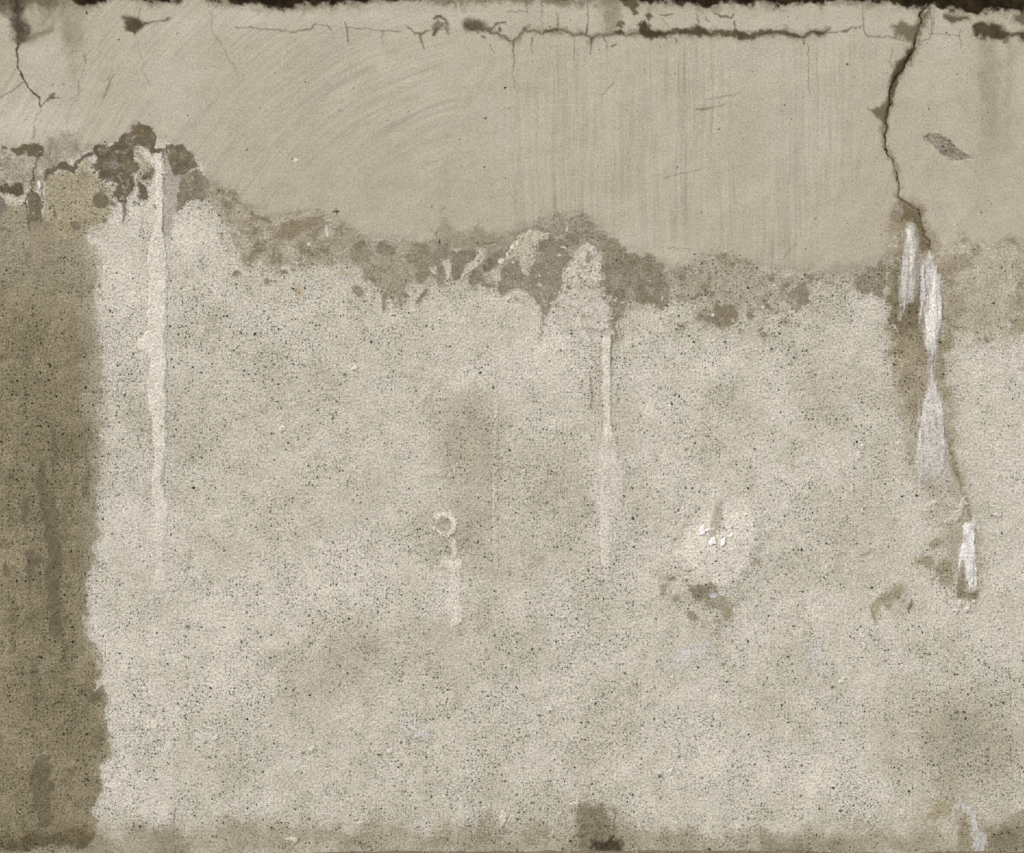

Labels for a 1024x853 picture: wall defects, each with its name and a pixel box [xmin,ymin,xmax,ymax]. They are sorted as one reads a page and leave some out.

crack [0,41,87,141]
flaking render [0,120,898,348]
leakage [0,0,1024,186]
crack [477,0,962,251]
spalling [921,133,974,163]
flaking render [931,229,1024,353]
leakage [0,193,1024,853]